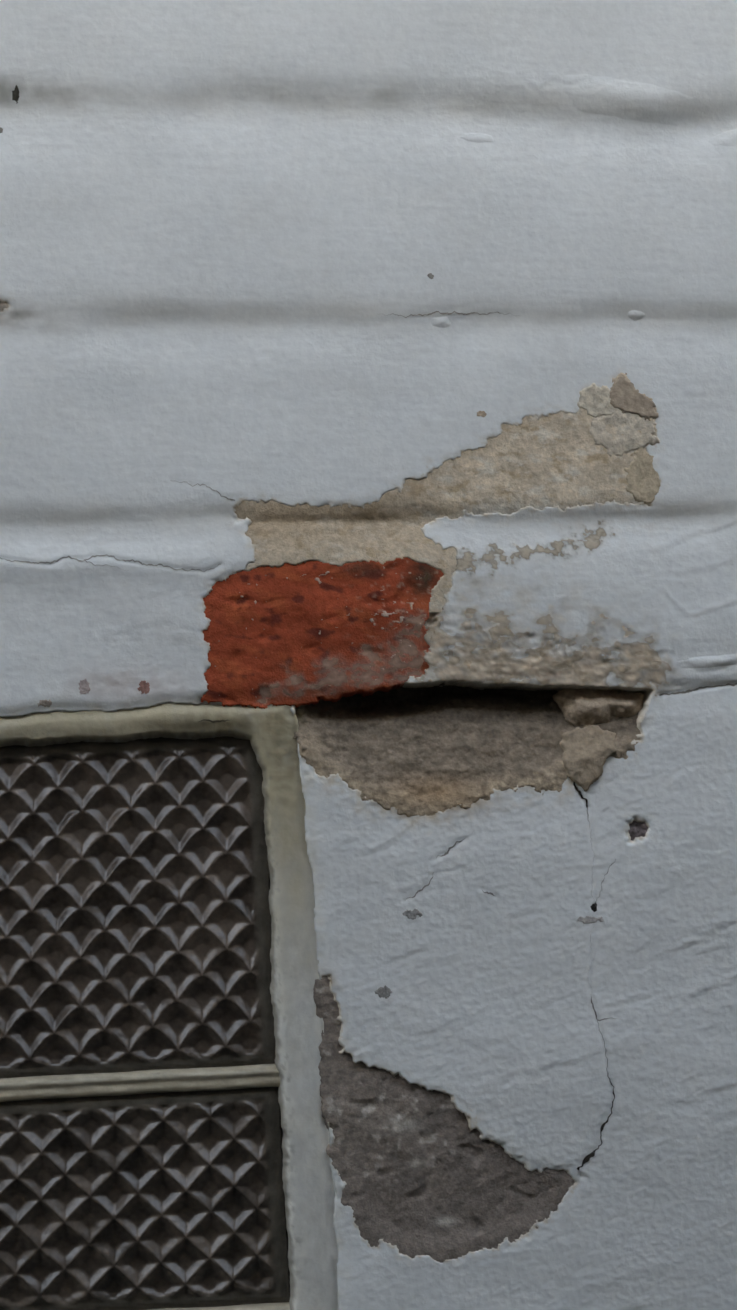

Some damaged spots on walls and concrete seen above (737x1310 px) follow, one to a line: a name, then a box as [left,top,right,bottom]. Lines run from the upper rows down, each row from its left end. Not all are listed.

spalling [201,373,671,817]
spalling [313,976,575,1263]
crack [573,782,620,1170]
peeling [629,820,649,841]